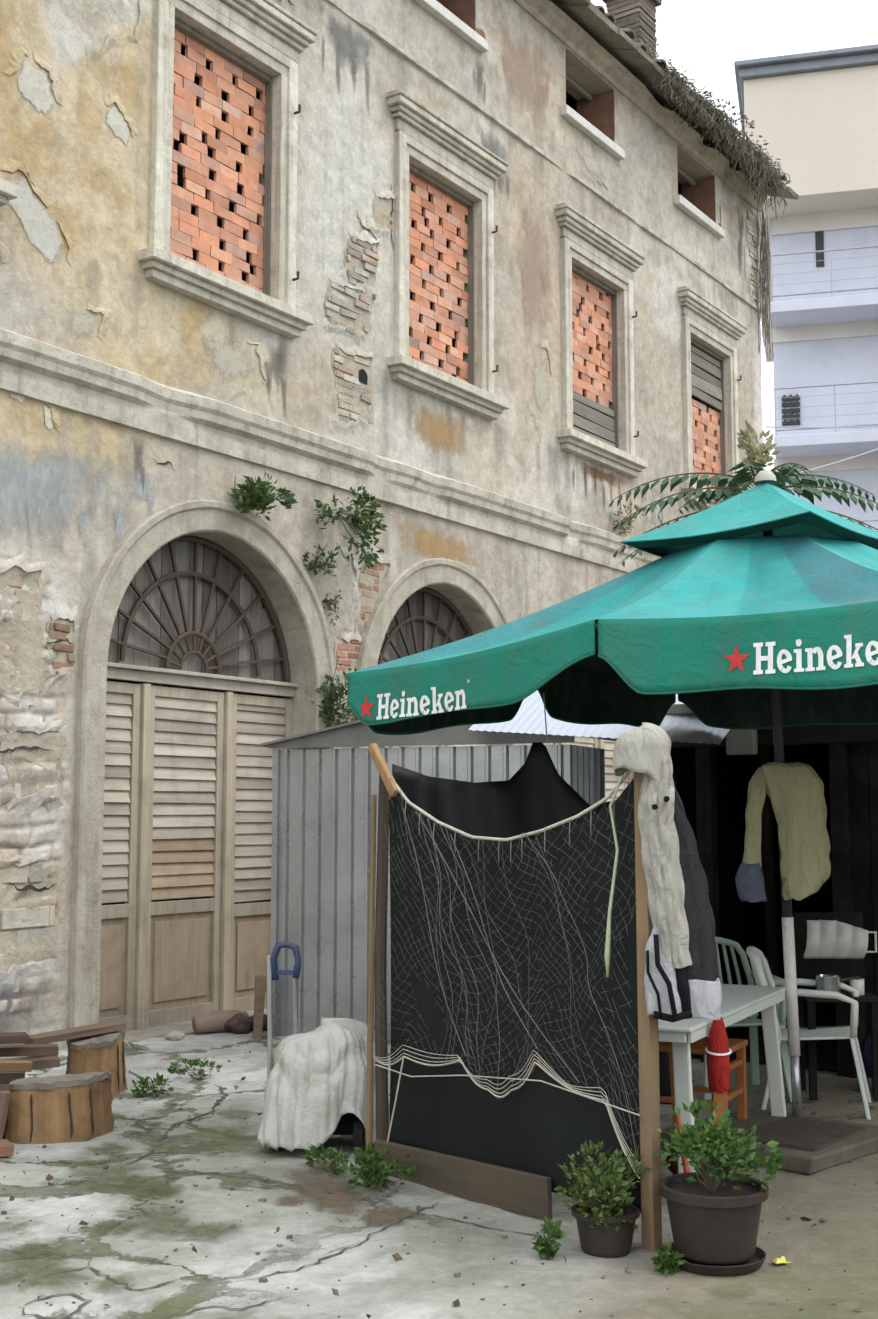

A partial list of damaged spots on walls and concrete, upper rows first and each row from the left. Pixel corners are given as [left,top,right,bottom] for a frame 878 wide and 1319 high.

flaking render [0,45,65,115]
flaking render [102,91,139,145]
leakage [323,21,370,108]
flaking render [0,158,77,268]
spalling [322,184,396,436]
leakage [0,452,97,537]
leakage [135,448,154,510]
spalling [0,552,81,814]
crack [0,745,53,753]
crack [9,882,57,896]
crack [126,1070,228,1165]